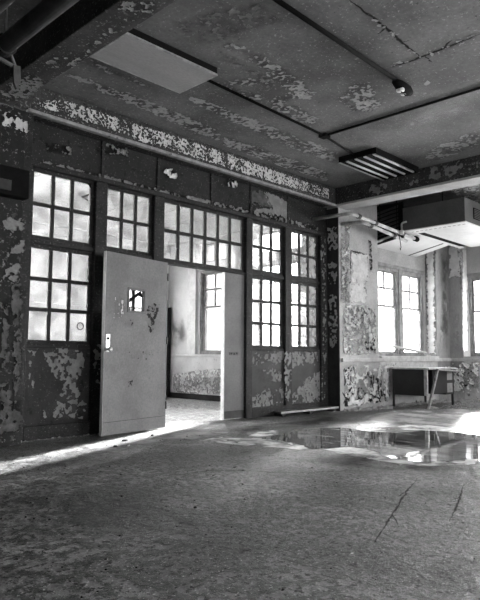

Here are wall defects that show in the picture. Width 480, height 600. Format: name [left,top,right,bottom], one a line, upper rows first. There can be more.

crack [351,1,479,67]
peeling [39,1,335,199]
peeling [340,83,384,112]
peeling [2,112,28,133]
peeling [3,217,25,233]
peeling [7,240,25,257]
flaking render [43,161,378,407]
peeling [0,263,87,434]
peeling [344,364,394,407]
peeling [441,362,479,393]
crack [374,478,418,542]
crack [449,485,464,521]